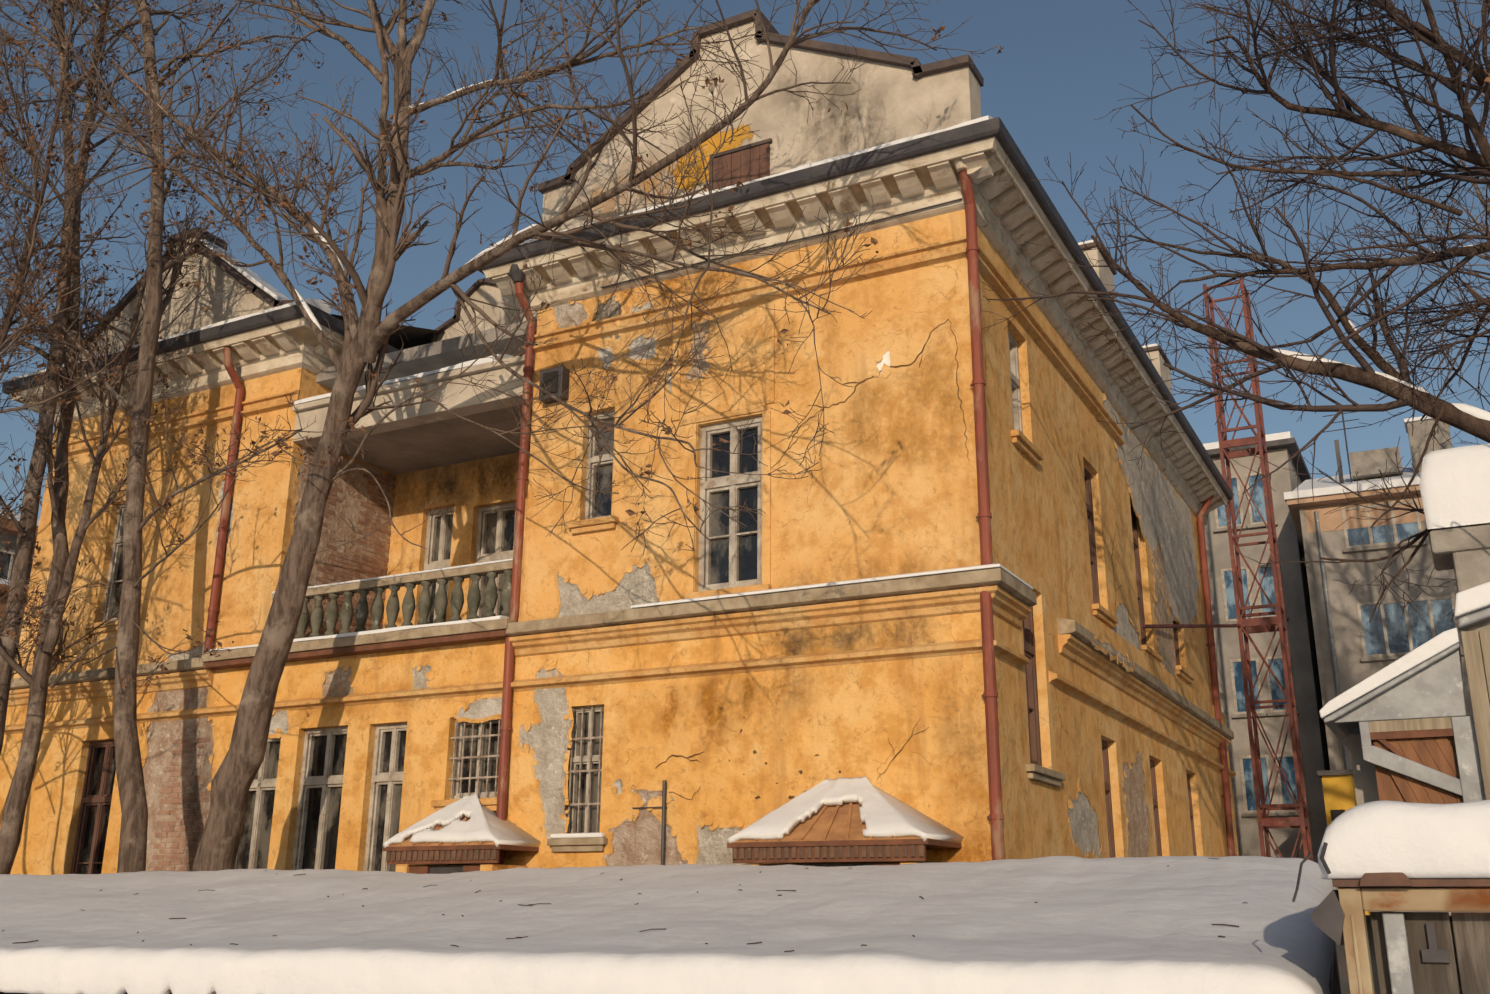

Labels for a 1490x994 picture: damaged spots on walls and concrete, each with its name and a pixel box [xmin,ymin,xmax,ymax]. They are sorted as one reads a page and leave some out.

peeling [549,292,713,395]
crack [759,319,995,477]
peeling [1091,392,1199,677]
peeling [554,556,665,618]
peeling [320,662,357,709]
flaking render [142,687,215,872]
peeling [454,655,574,839]
peeling [596,779,749,867]
crack [877,719,925,780]
peeling [1067,774,1102,858]
peeling [1121,747,1151,857]